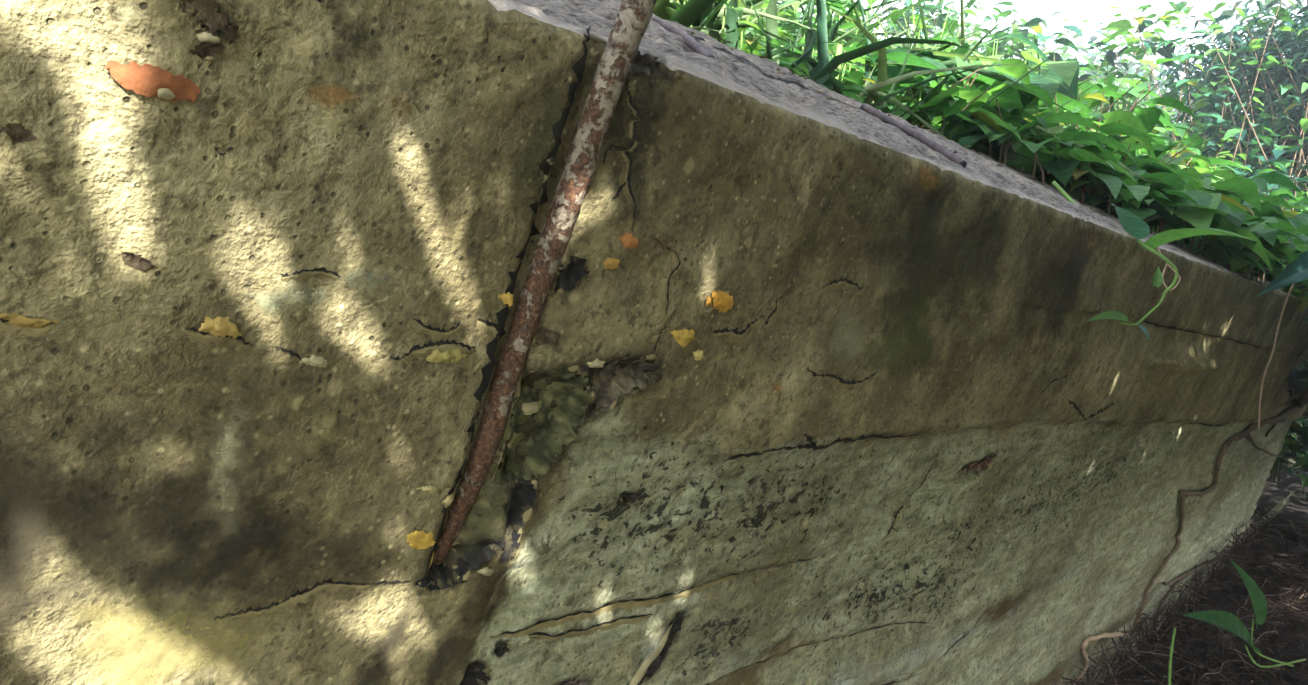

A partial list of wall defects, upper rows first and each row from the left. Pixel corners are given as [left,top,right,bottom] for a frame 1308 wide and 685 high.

water stain [614,86,658,218]
crack [603,83,683,354]
crack [213,23,592,622]
crack [807,367,877,391]
crack [1042,375,1115,424]
crack [723,431,937,540]